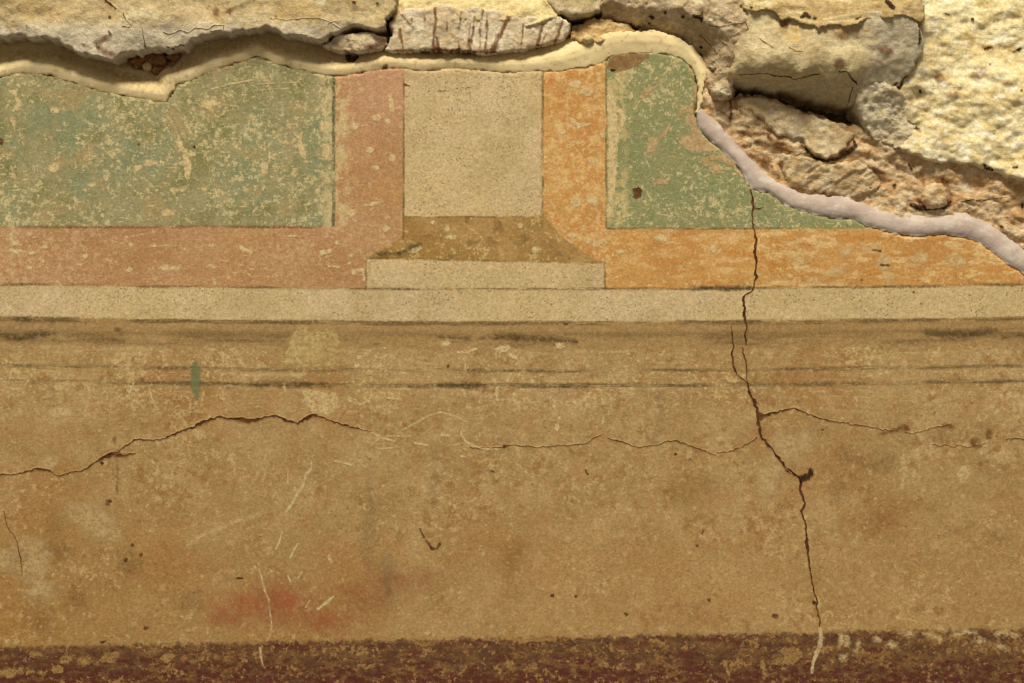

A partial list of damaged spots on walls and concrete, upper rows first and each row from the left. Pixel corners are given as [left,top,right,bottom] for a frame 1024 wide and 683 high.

crack [0,188,1024,674]
peeling [806,244,895,283]